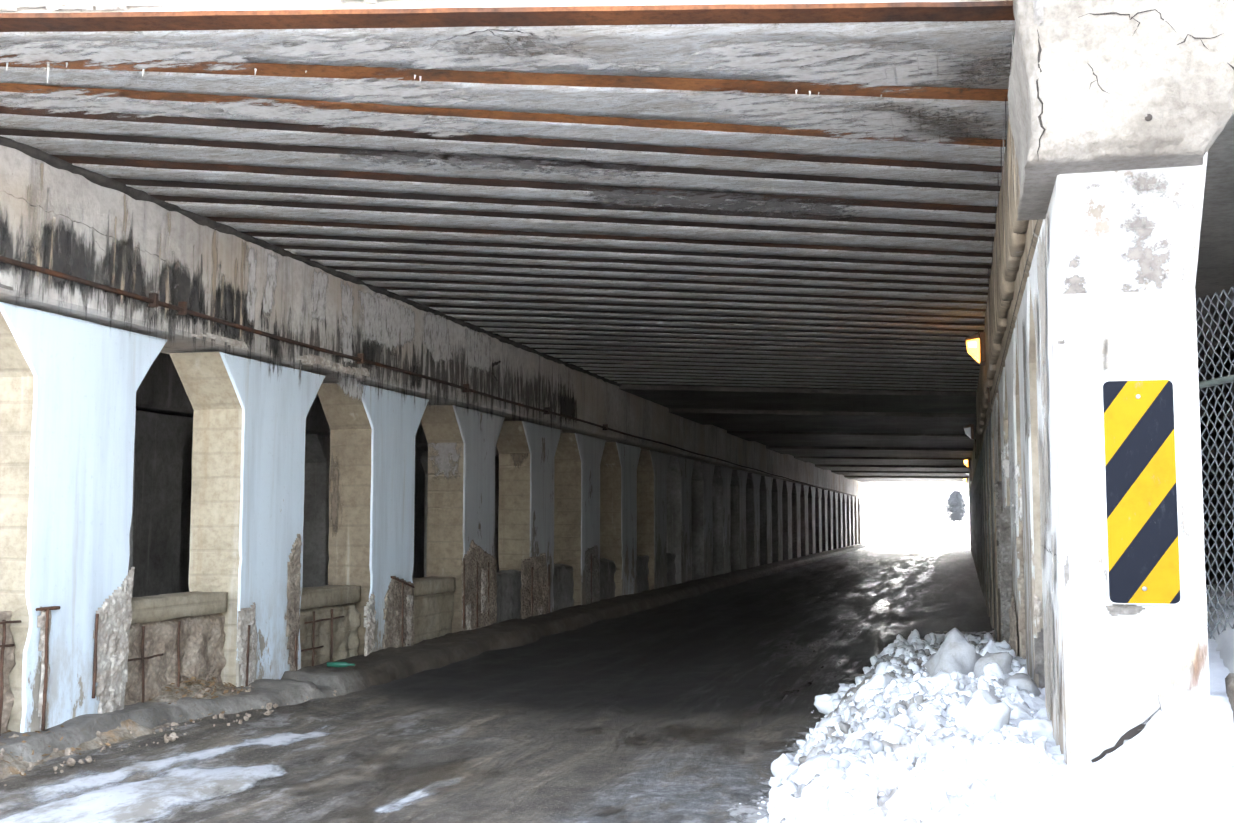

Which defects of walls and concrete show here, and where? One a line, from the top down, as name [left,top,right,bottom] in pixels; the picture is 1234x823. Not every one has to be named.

spalling [0,0,161,11]
leakage [0,31,856,221]
crack [1036,29,1049,160]
crack [1078,9,1234,70]
leakage [0,163,577,426]
peeling [1063,254,1087,294]
peeling [1121,173,1202,293]
peeling [1084,331,1162,380]
peeling [1182,429,1203,558]